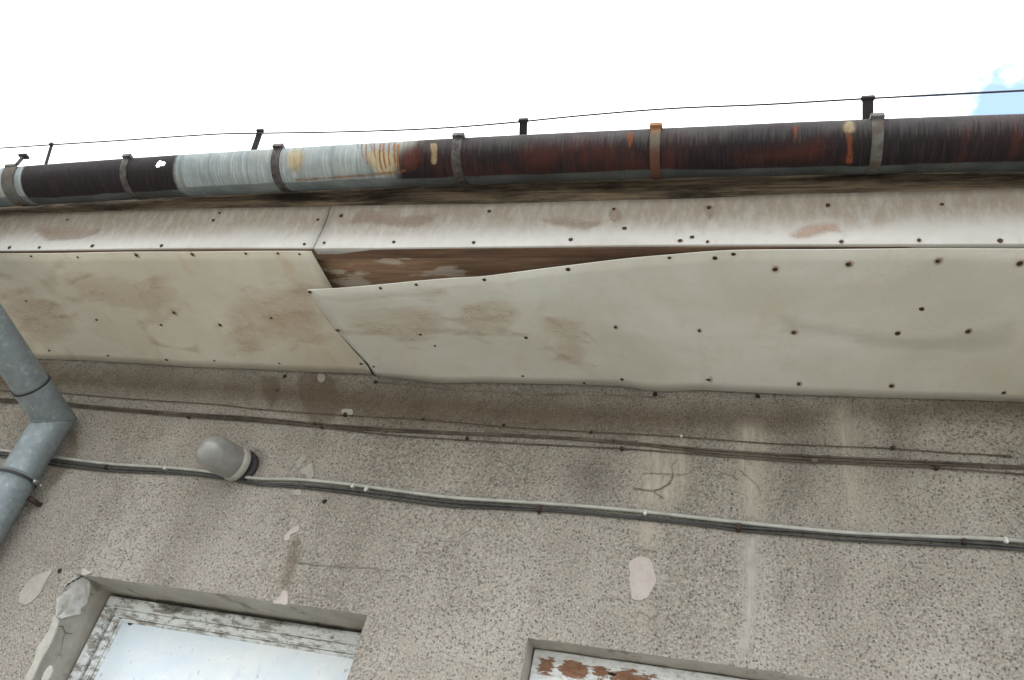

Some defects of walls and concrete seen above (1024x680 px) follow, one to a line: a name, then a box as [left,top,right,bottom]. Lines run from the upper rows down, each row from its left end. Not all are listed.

crack [633,459,761,499]
flaking render [628,556,657,601]
spalling [18,568,94,680]
peeling [534,657,660,680]